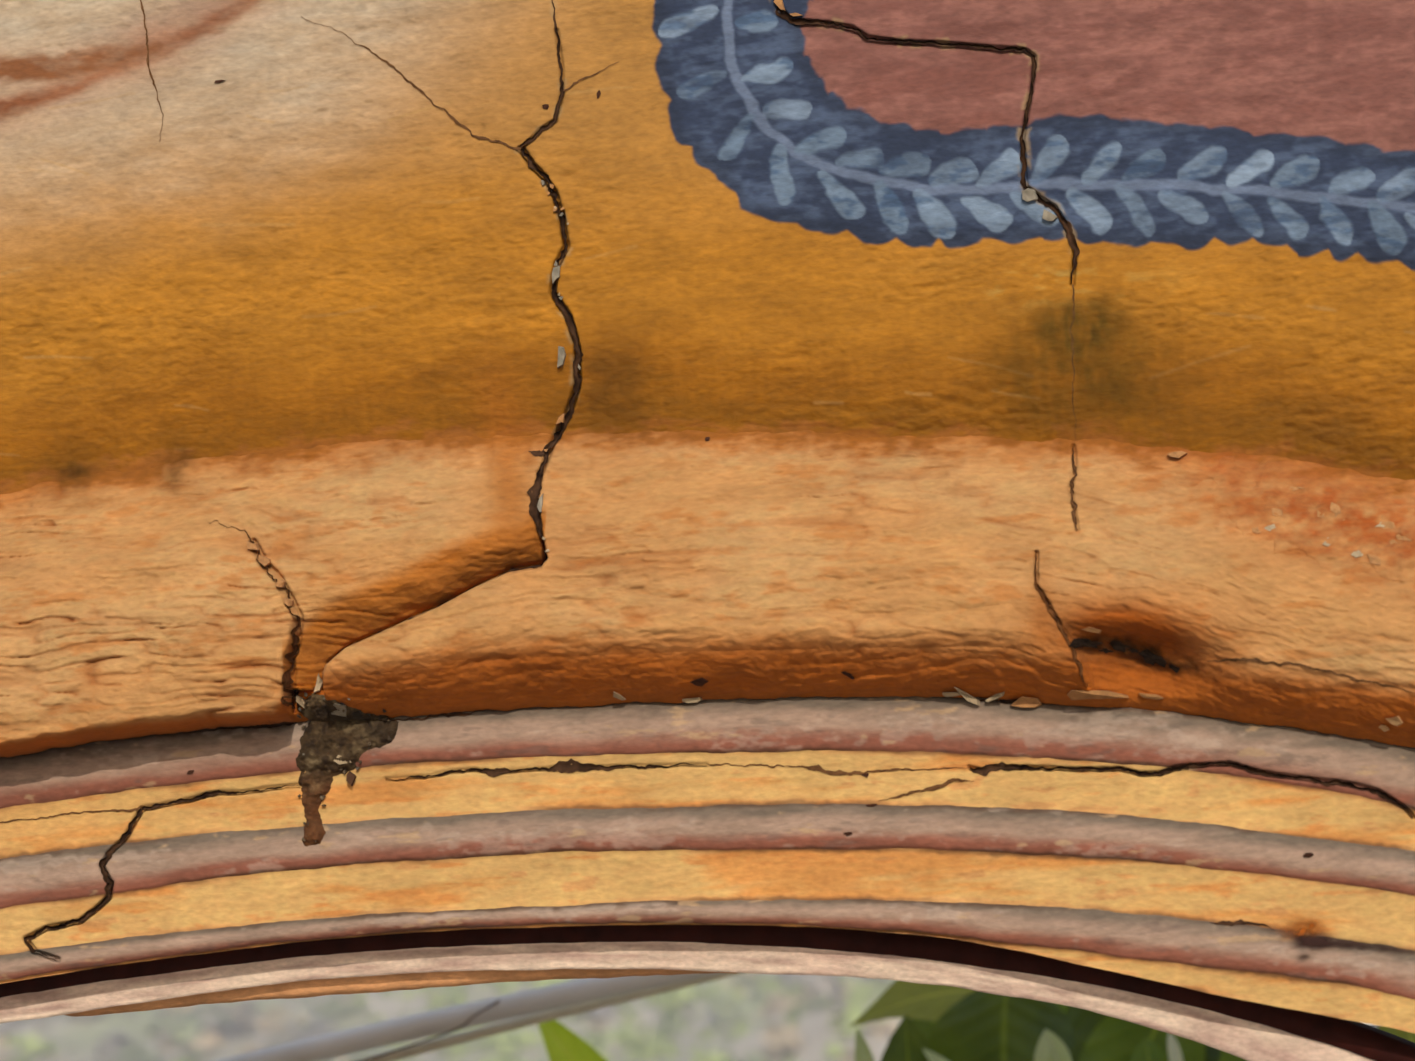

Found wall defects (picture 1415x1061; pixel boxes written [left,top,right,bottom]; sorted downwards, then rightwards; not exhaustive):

crack [774,0,1080,530]
crack [190,0,619,733]
crack [1035,553,1088,687]
crack [0,785,297,959]
spalling [295,674,399,846]
crack [387,758,1415,818]